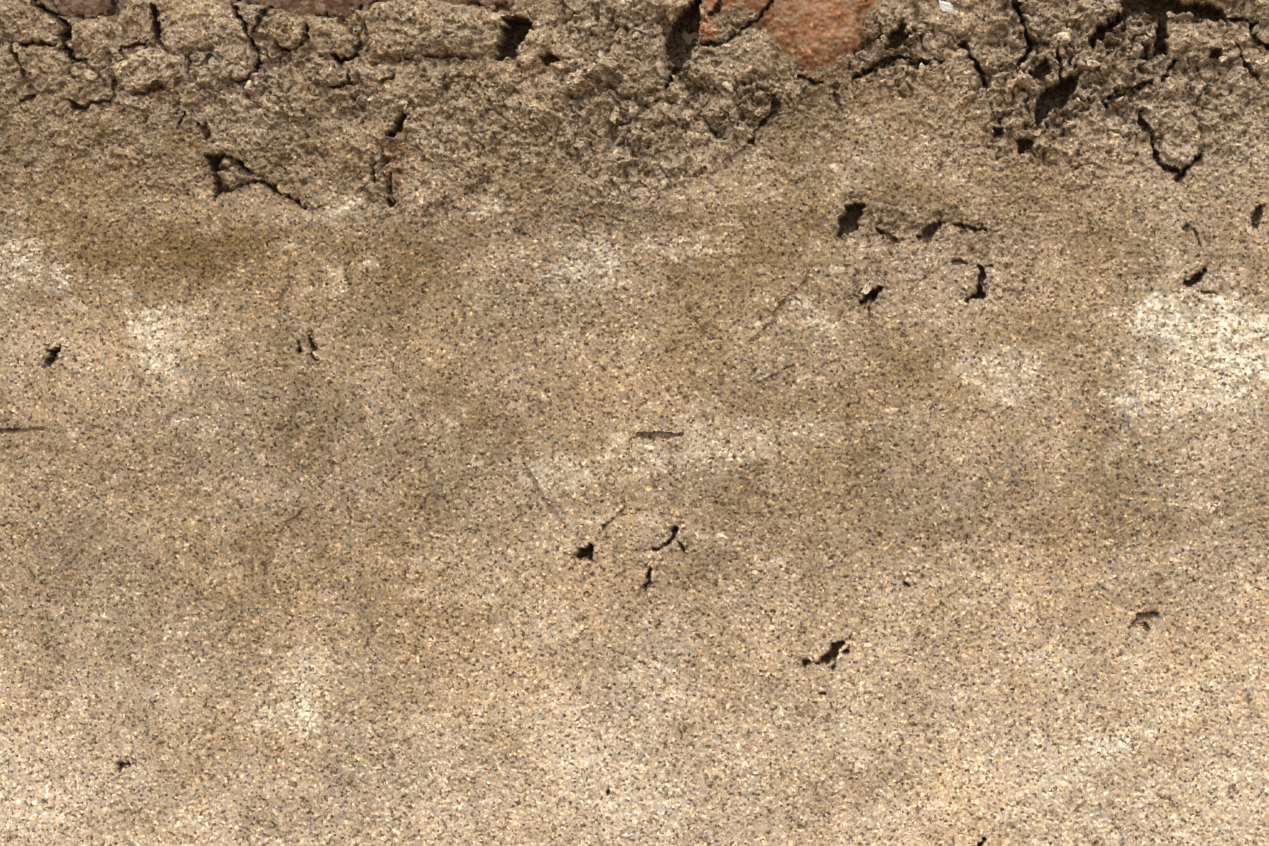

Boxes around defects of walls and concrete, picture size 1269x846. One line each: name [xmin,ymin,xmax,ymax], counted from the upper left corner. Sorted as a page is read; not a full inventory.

spalling [0,0,1269,219]
crack [699,0,775,48]
crack [748,40,987,144]
crack [1011,0,1064,84]
crack [1102,84,1204,183]
crack [1210,17,1269,85]